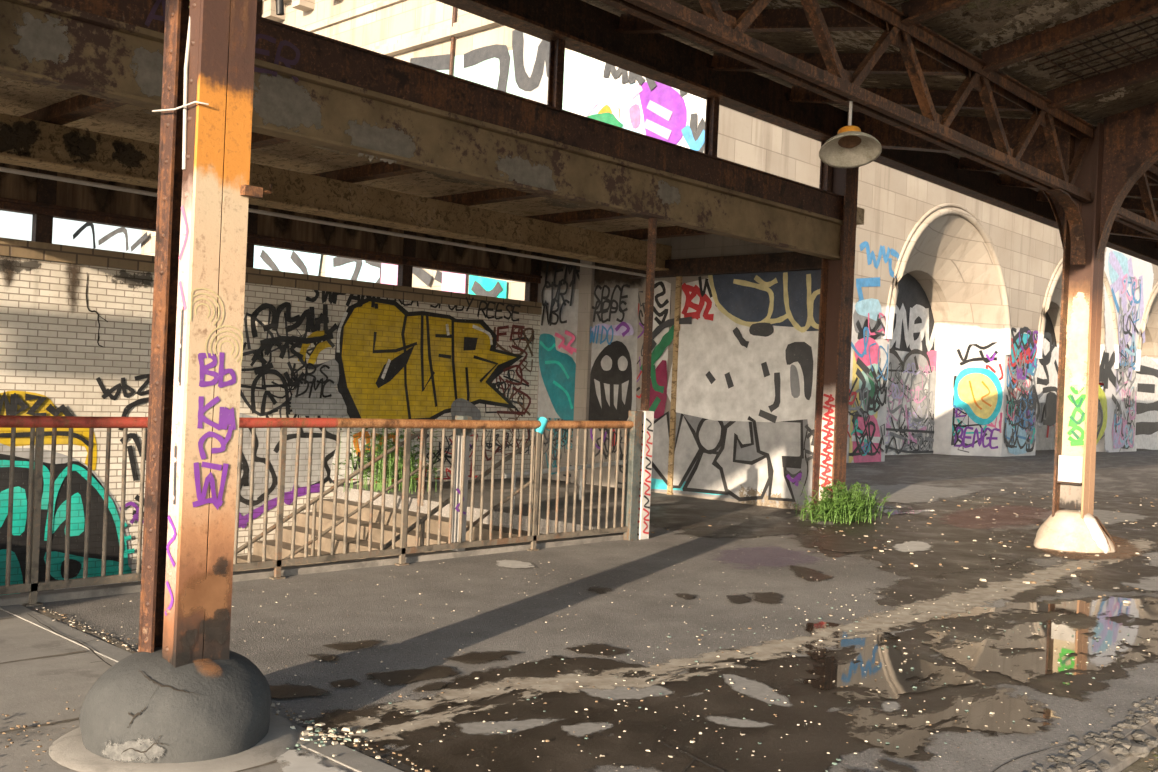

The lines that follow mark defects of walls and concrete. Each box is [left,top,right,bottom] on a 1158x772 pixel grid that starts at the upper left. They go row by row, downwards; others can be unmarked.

peeling [13,12,72,64]
peeling [130,47,163,115]
peeling [253,73,324,132]
leakage [0,116,42,187]
leakage [63,128,147,168]
leakage [88,177,116,212]
leakage [138,186,158,211]
leakage [66,263,80,310]
corrosion [180,572,230,619]
crack [27,613,111,666]
crack [121,670,199,757]
spalling [102,735,165,763]